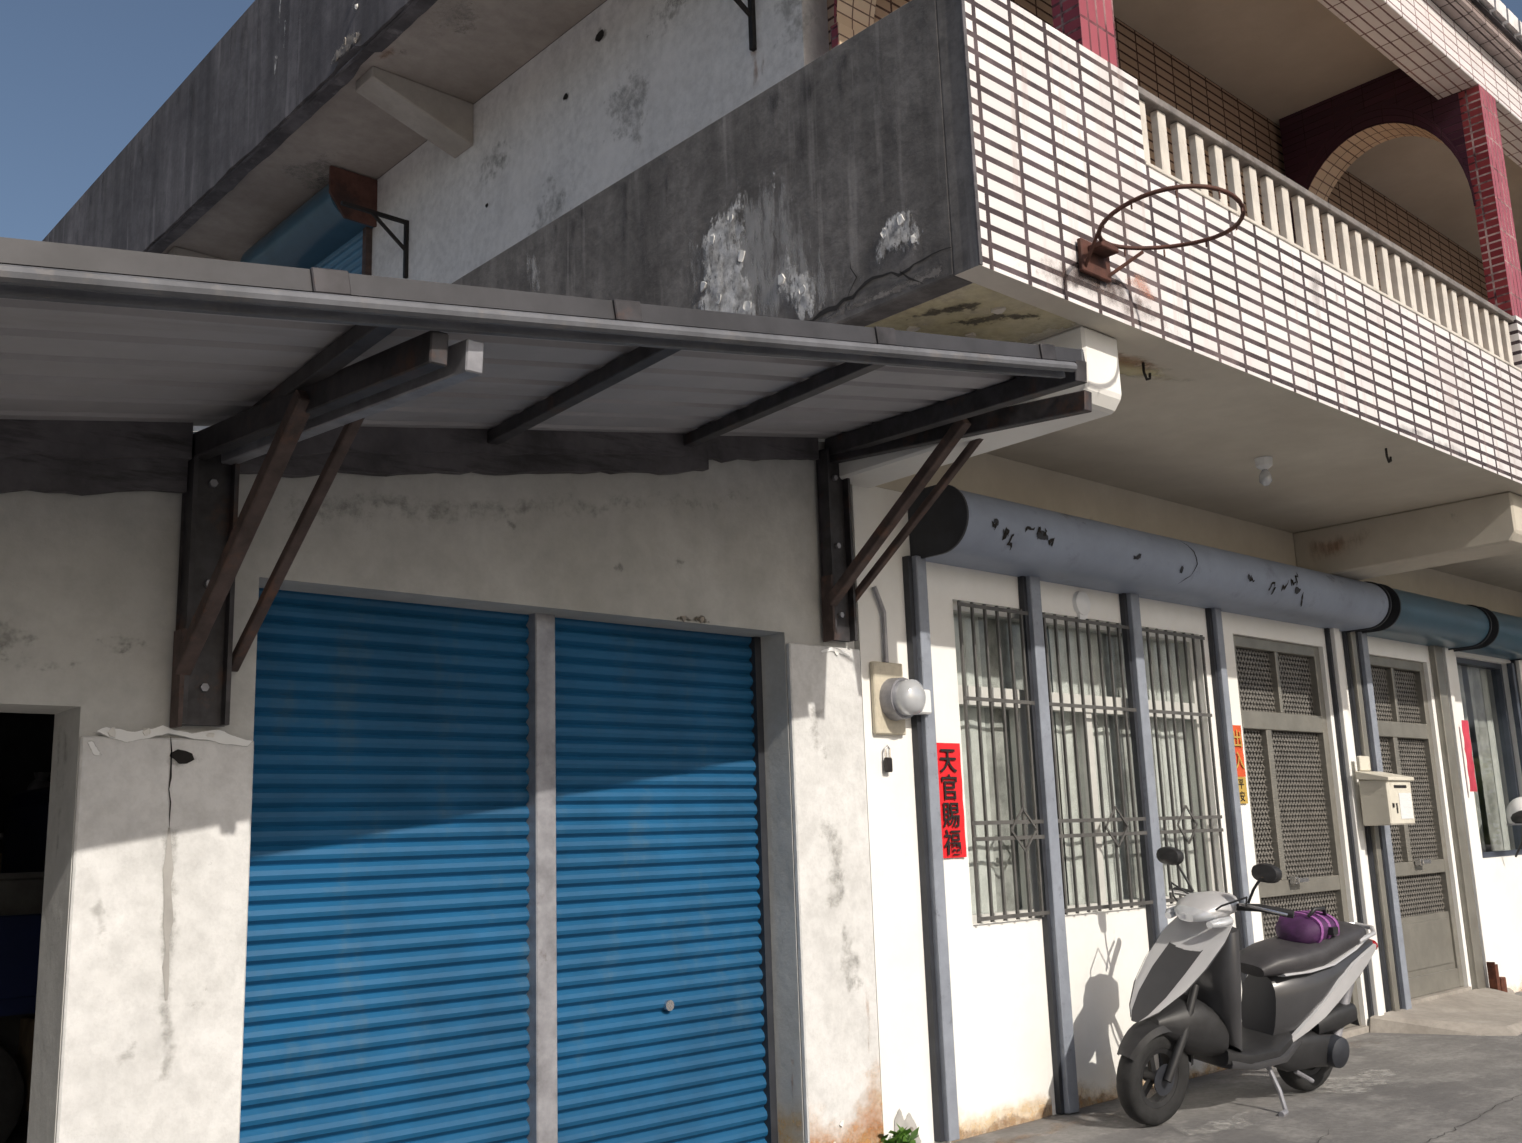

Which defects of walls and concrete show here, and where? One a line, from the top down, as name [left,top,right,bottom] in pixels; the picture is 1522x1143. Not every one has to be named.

peeling [697,195,760,315]
peeling [778,233,816,320]
crack [805,247,951,321]
peeling [877,211,919,260]
crack [162,828,174,1000]
rust [810,1103,884,1143]
crack [1424,1095,1520,1143]